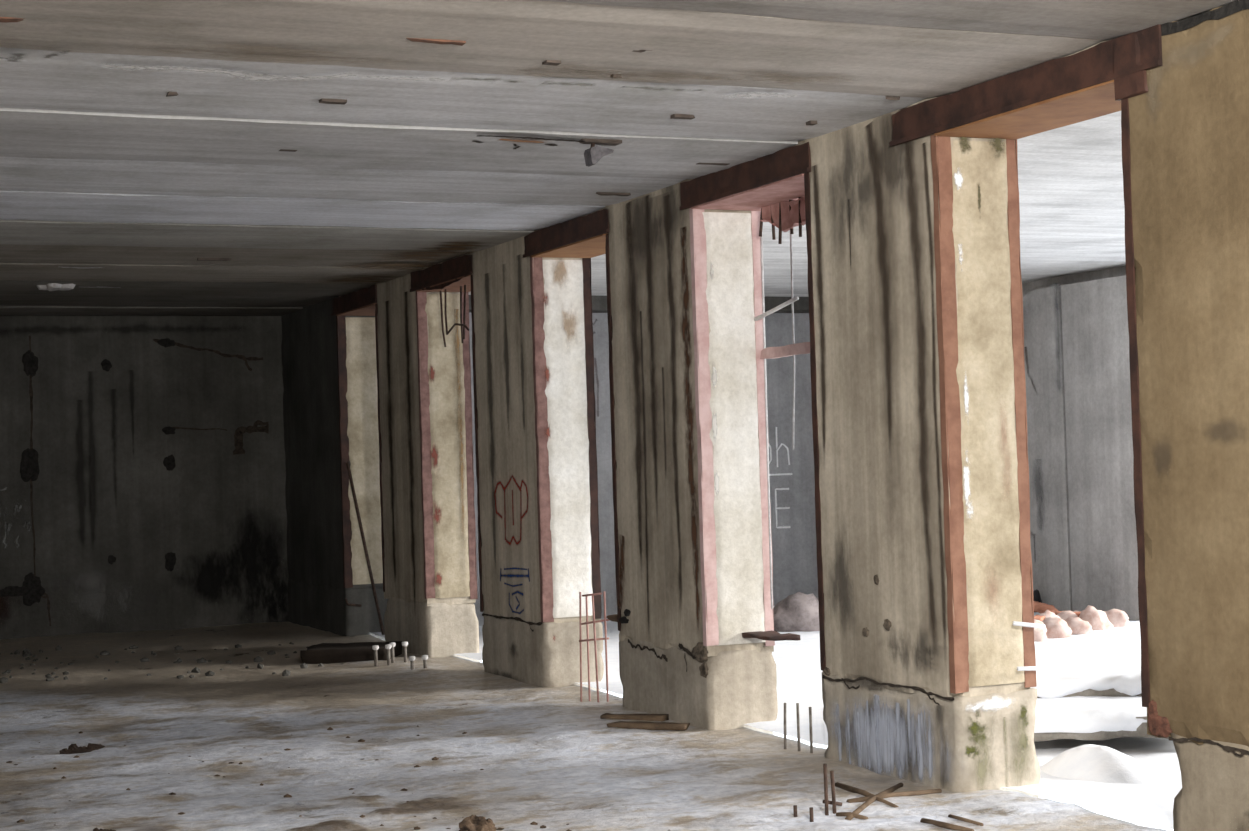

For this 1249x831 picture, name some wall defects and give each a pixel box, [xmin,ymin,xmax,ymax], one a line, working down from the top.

damp [813,165,825,448]
damp [485,255,525,558]
damp [842,122,946,665]
damp [193,515,289,622]
damp [833,549,850,617]
crack [628,639,696,672]
crack [823,675,954,705]
damp [836,680,945,783]
crack [1169,736,1249,757]